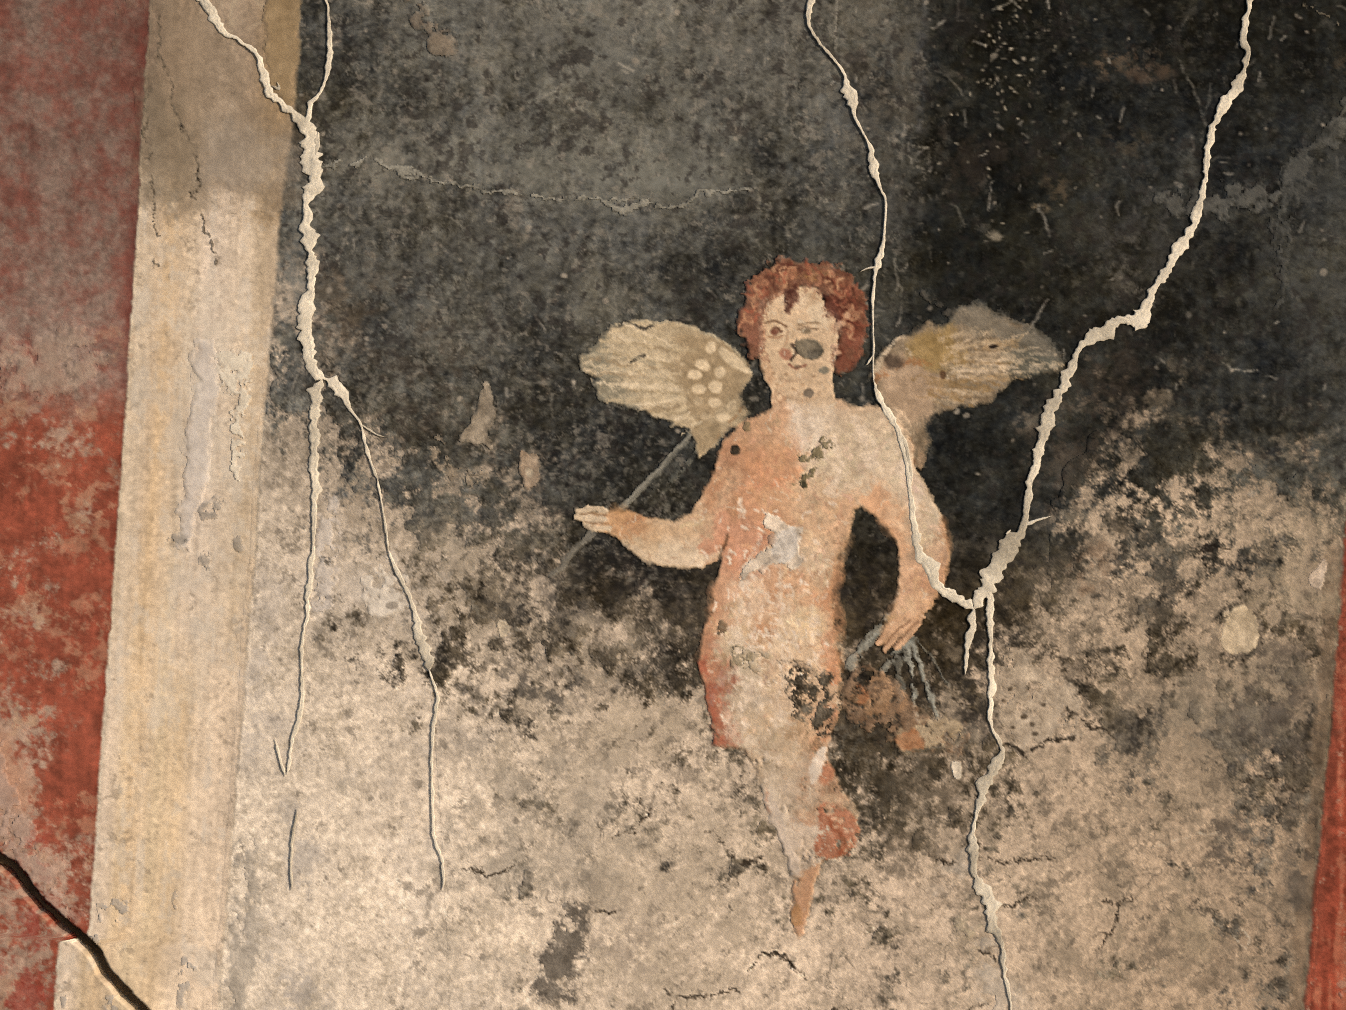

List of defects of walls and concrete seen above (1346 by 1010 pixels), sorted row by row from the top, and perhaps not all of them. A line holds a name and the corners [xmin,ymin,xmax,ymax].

crack [141,127,161,268]
damp [306,493,344,614]
crack [196,0,515,889]
damp [360,543,417,620]
crack [806,0,1253,1010]
peeling [212,345,1346,1010]
crack [0,853,148,1010]
damp [222,836,270,1010]
damp [973,922,1021,1010]